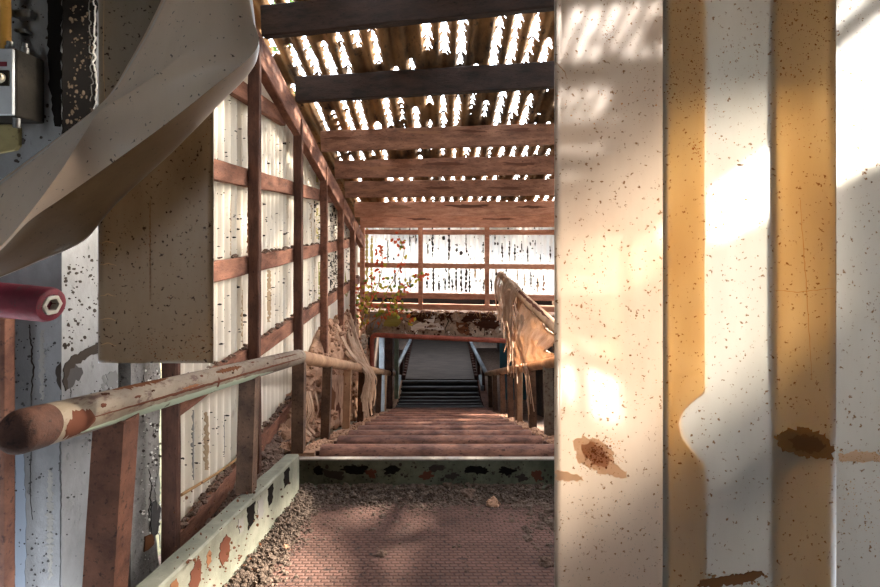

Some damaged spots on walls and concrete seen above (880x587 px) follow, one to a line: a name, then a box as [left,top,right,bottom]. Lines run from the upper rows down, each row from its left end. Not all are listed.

spalling [67,365,83,389]
peeling [308,463,553,483]
corrosion [572,433,627,479]
corrosion [774,427,880,463]
peeling [247,467,290,530]